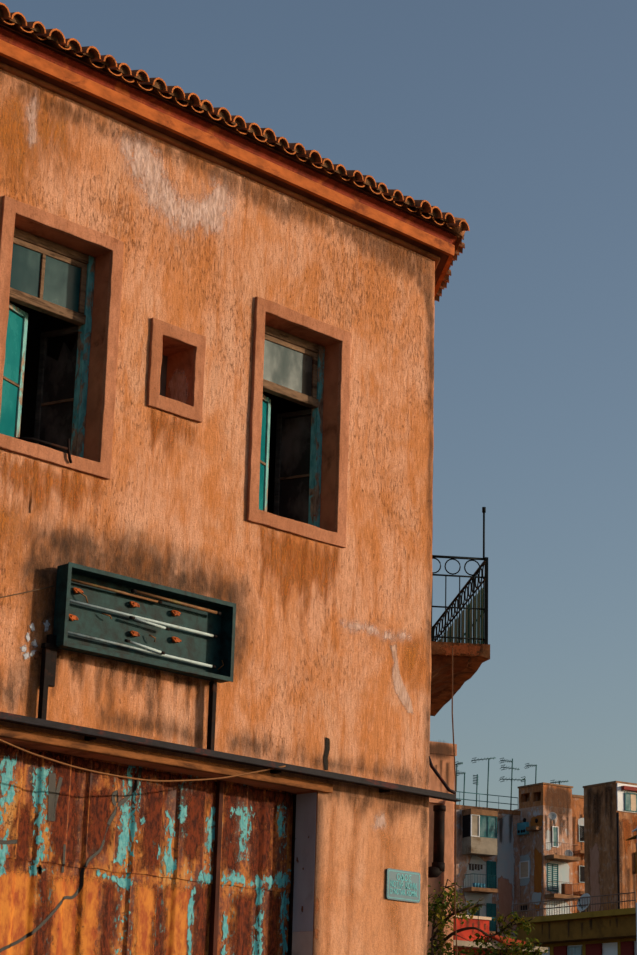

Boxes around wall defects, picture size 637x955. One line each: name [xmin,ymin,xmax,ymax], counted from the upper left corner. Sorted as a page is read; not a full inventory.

leakage [122,133,434,380]
peeling [0,755,19,877]
peeling [28,766,53,876]
peeling [97,765,145,890]
corrosion [0,745,293,955]
peeling [157,804,188,876]
peeling [187,805,304,955]